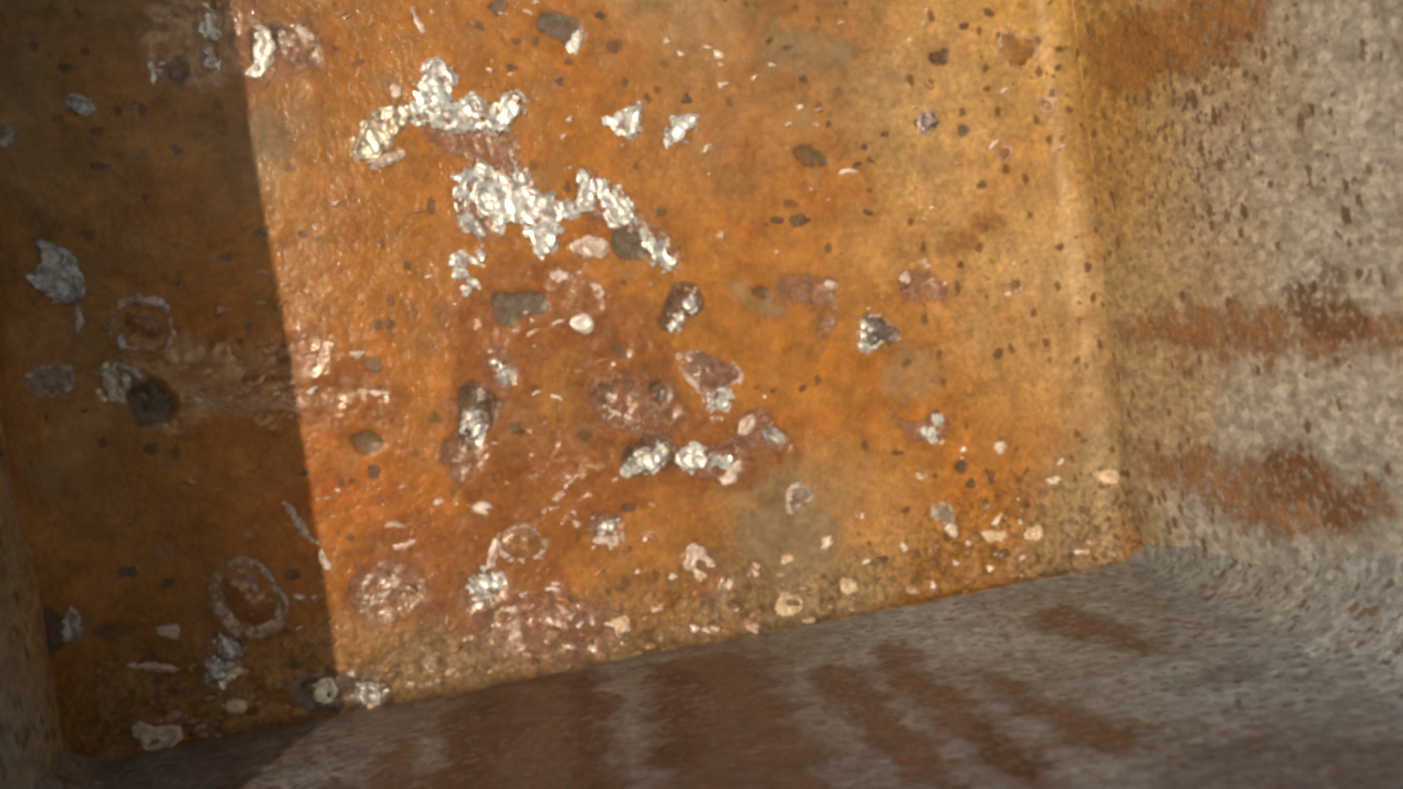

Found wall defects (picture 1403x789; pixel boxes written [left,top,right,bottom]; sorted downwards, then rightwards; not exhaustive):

peeling [245,23,321,77]
peeling [25,239,86,306]
peeling [348,57,703,480]
rust [1118,301,1403,370]
peeling [587,374,792,486]
rust [1146,445,1395,540]
peeling [289,670,393,713]